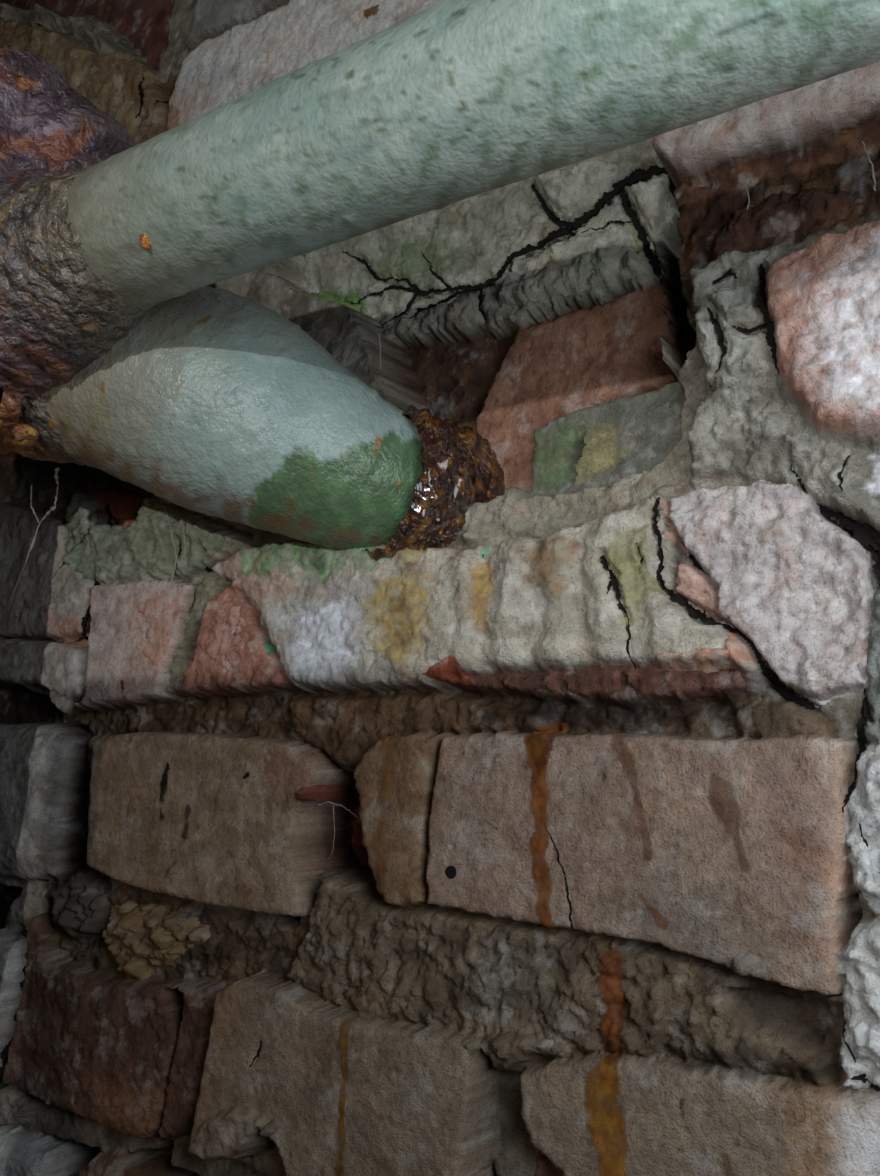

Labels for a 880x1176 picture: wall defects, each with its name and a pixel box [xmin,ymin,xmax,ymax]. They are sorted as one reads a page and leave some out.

crack [342,165,668,328]
crack [707,264,779,375]
crack [600,497,816,710]
crack [790,455,880,586]
rust [525,722,568,930]
rust [586,951,628,1176]